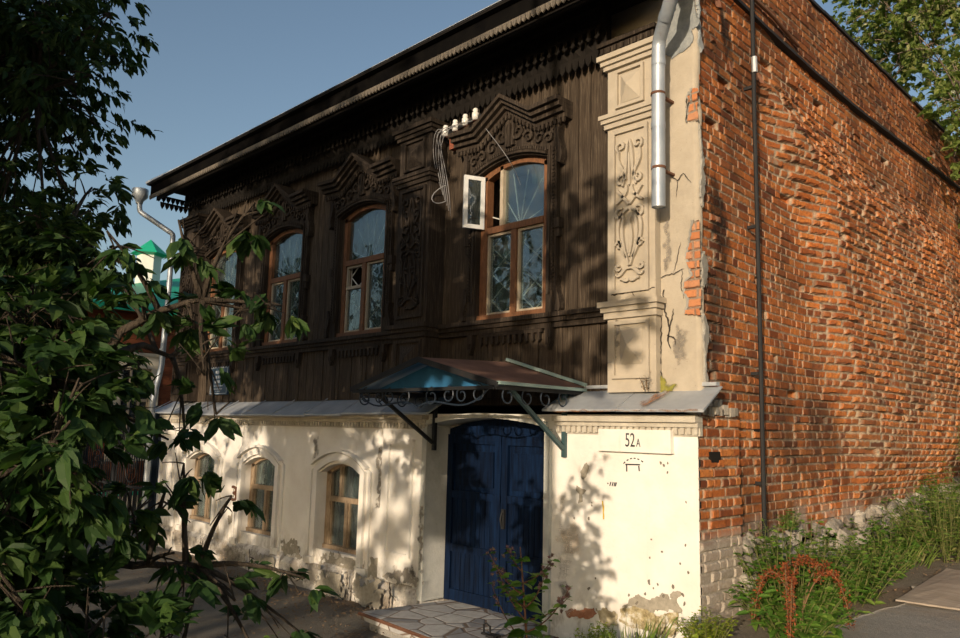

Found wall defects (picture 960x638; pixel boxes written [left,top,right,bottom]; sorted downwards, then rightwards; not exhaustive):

spalling [685,88,699,123]
spalling [682,220,702,315]
peeling [223,538,302,579]
peeling [314,551,384,610]
spalling [566,579,685,638]